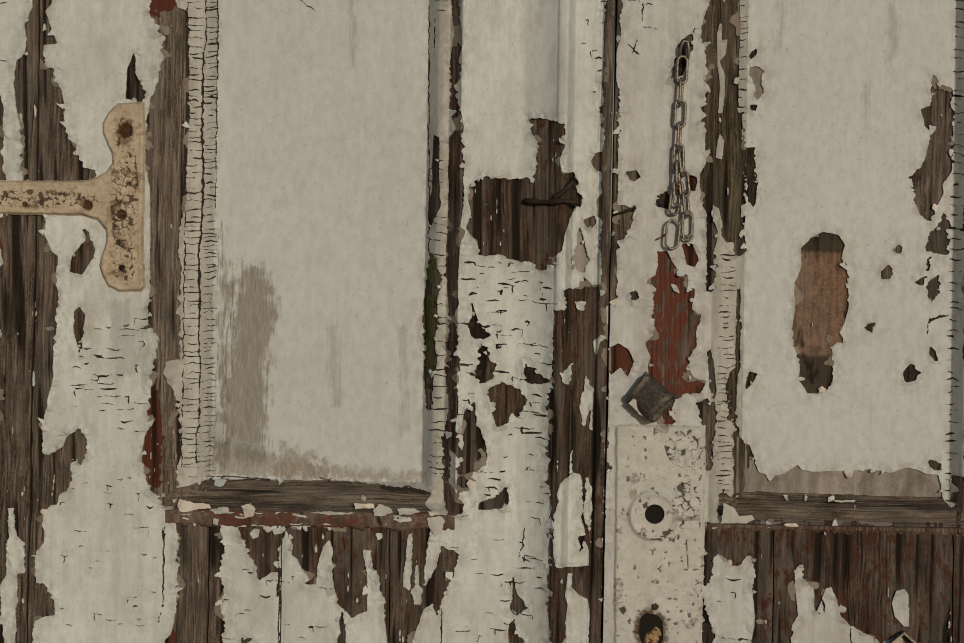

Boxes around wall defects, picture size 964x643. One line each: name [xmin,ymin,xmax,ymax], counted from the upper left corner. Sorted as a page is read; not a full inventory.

peeling [0,214,87,643]
peeling [14,0,96,181]
crack [71,316,153,432]
crack [179,0,270,482]
leakage [217,266,278,454]
crack [224,534,321,643]
peeling [126,0,432,513]
peeling [238,524,459,643]
crack [380,0,556,643]
peeling [422,0,640,643]
peeling [646,0,964,643]
crack [927,0,964,504]